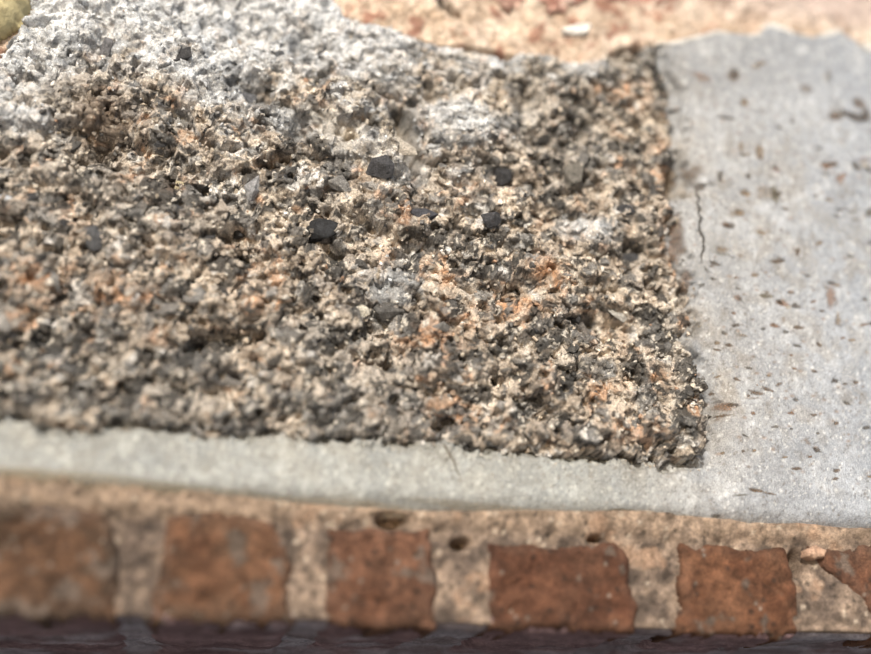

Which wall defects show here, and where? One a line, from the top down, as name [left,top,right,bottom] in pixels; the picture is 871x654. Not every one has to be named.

spalling [0,0,729,475]
crack [695,190,709,273]